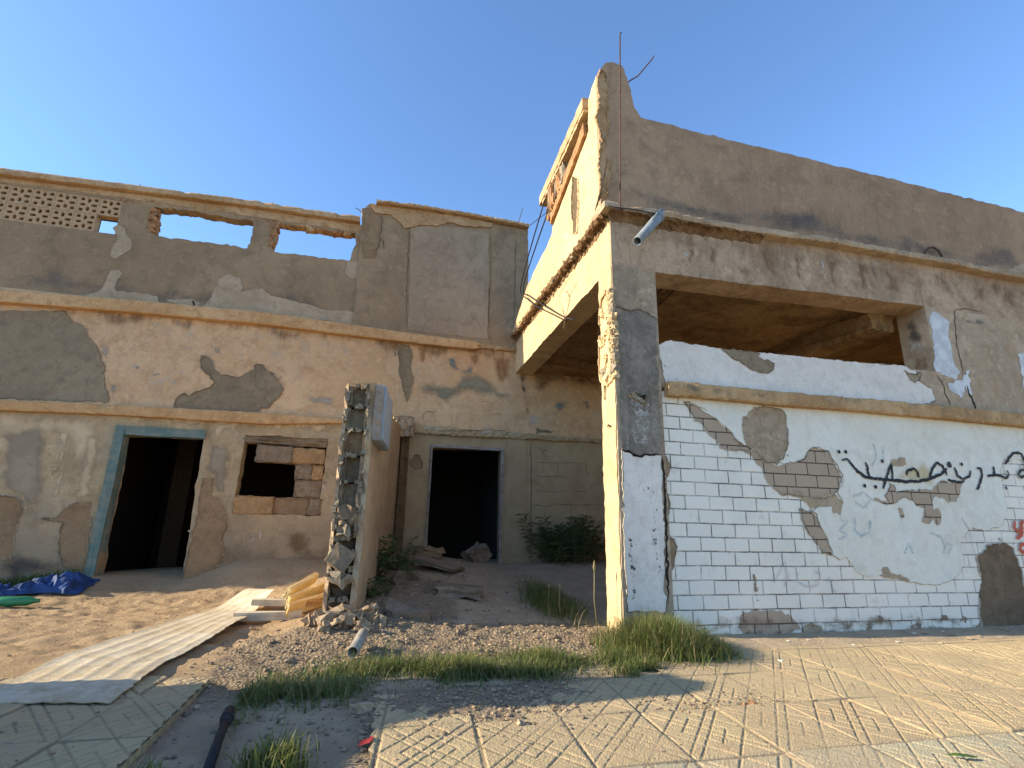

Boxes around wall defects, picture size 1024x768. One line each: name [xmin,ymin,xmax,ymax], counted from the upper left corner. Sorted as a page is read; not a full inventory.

peeling [0,310,110,403]
peeling [173,355,285,412]
peeling [396,344,415,402]
spalling [597,287,620,400]
peeling [722,348,775,373]
crack [822,308,982,409]
spalling [741,405,789,465]
peeling [40,501,92,571]
peeling [181,478,228,579]
crack [622,449,669,613]
peeling [874,480,963,525]
peeling [738,609,825,634]